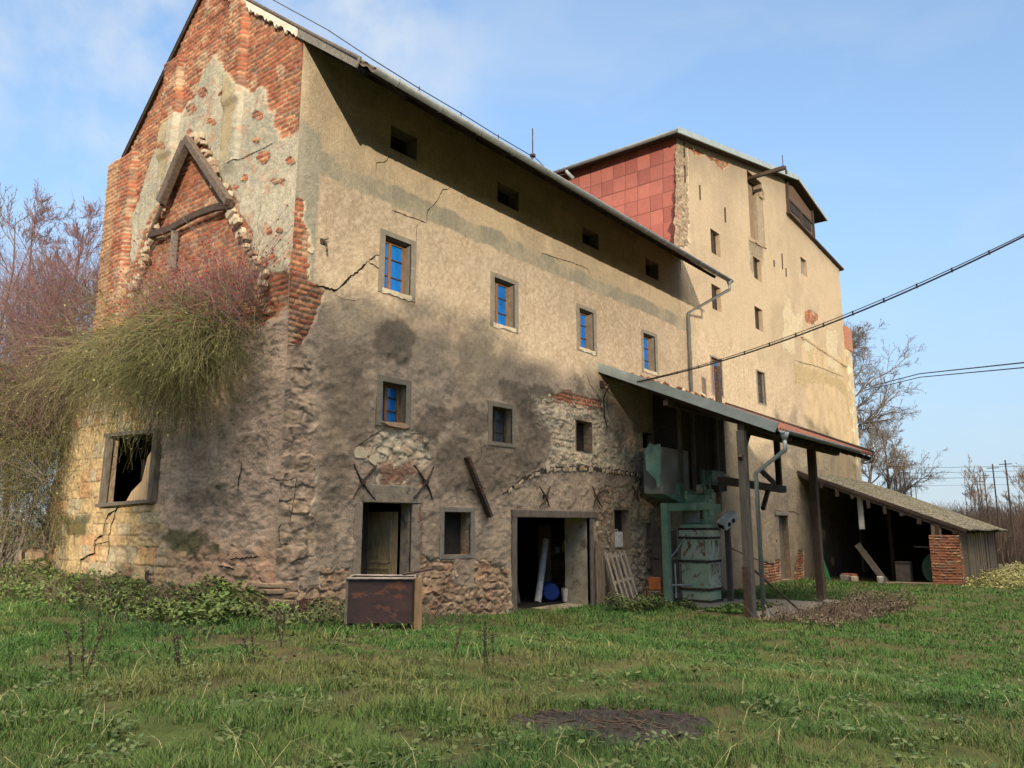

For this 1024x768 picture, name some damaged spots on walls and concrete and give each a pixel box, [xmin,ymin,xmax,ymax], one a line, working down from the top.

flaking render [186,87,223,115]
flaking render [127,192,172,297]
flaking render [181,118,277,287]
flaking render [270,156,295,185]
crack [313,254,386,301]
crack [392,188,449,236]
flaking render [673,145,729,247]
peeling [782,299,839,372]
flaking render [353,427,431,486]
flaking render [502,390,666,601]
crack [79,500,121,569]
flaking render [418,511,513,617]